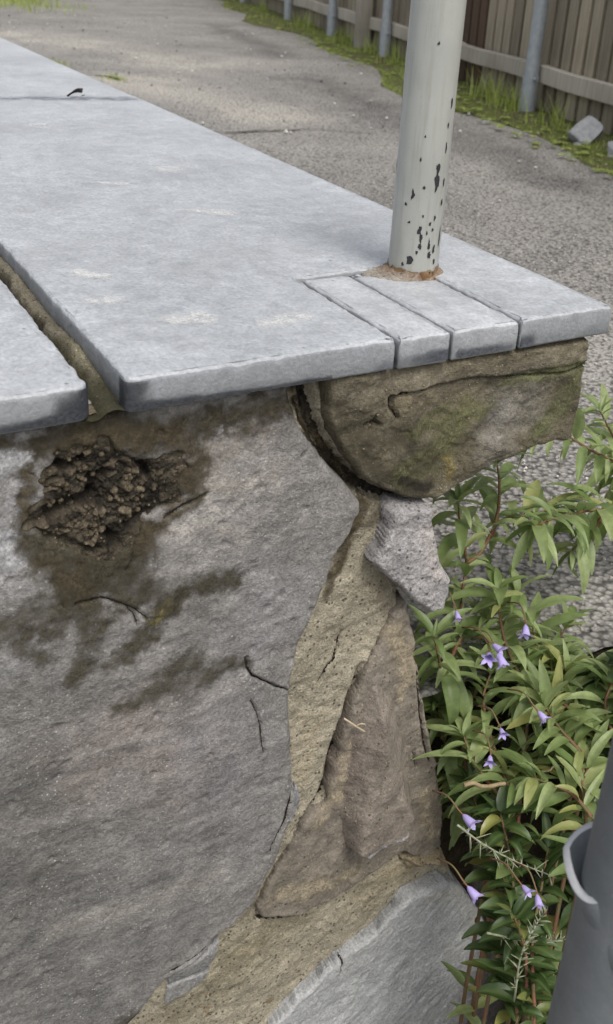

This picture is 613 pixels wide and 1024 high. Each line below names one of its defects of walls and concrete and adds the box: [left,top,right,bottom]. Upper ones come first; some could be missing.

peeling [401,142,447,266]
corrosion [387,261,439,280]
crack [369,389,423,424]
spalling [22,436,194,561]
water stain [0,376,372,688]
crack [74,596,146,624]
water stain [114,650,252,712]
crack [244,658,288,750]
crack [317,635,339,681]